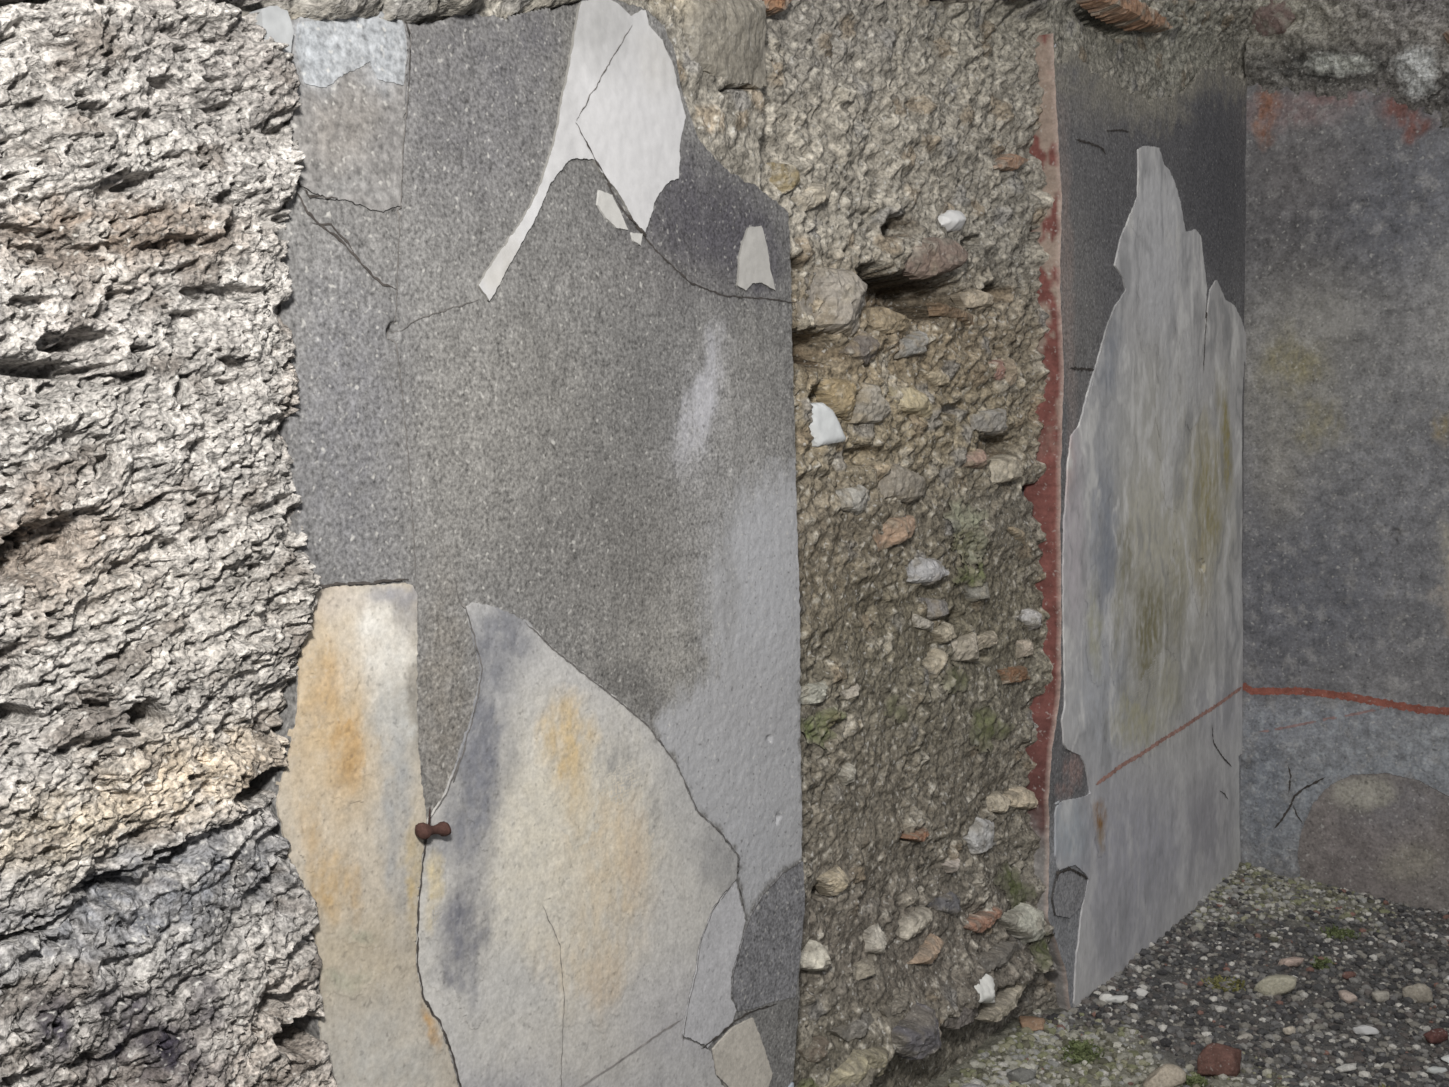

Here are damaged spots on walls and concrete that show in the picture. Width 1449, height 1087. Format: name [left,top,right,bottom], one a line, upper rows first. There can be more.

peeling [477,0,686,301]
peeling [736,226,776,291]
crack [416,580,483,1087]
crack [526,623,801,1087]
spalling [1051,870,1087,918]
crack [1275,767,1325,828]